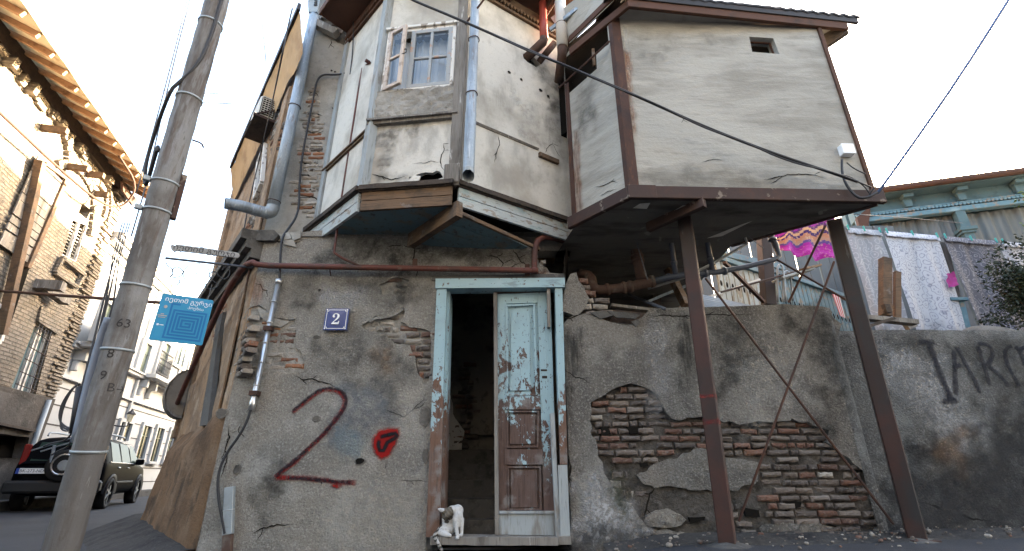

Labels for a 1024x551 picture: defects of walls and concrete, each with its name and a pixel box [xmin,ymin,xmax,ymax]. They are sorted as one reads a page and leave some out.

spalling [288,86,333,218]
crack [376,143,449,180]
crack [764,172,820,183]
spalling [230,306,305,380]
spalling [363,307,435,384]
spalling [590,384,717,535]
spalling [720,420,879,533]